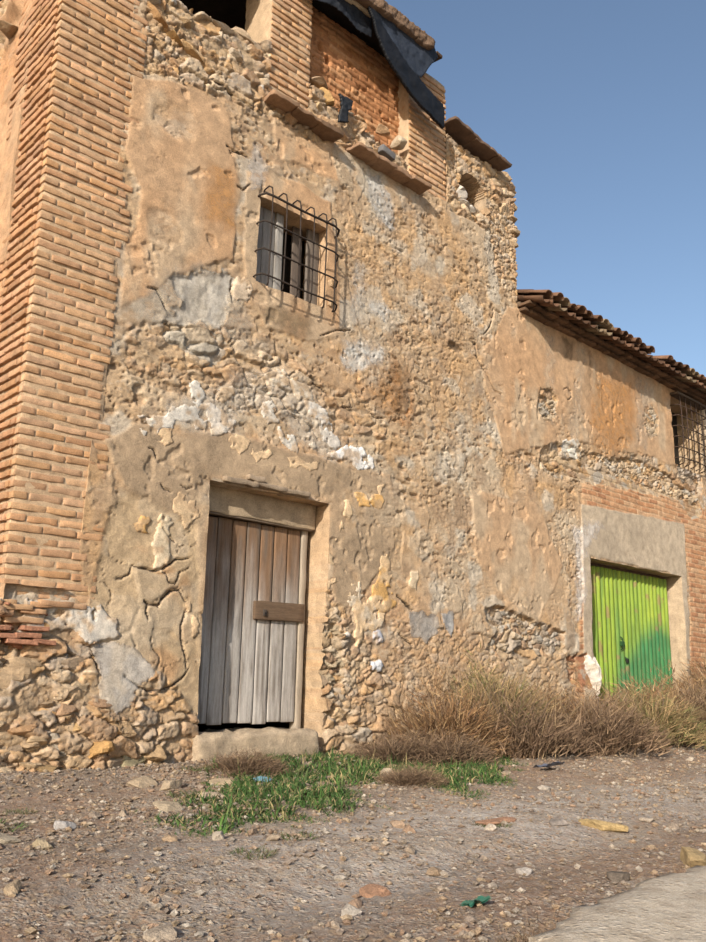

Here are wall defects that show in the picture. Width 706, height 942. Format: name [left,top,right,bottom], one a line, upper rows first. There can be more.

flaking render [148,265,253,367]
flaking render [137,380,272,462]
flaking render [251,367,375,471]
flaking render [335,484,385,541]
flaking render [538,441,703,520]
flaking render [16,597,155,714]
crack [116,540,189,693]
flaking render [184,601,201,638]
flaking render [319,554,454,743]
flaking render [484,605,594,690]